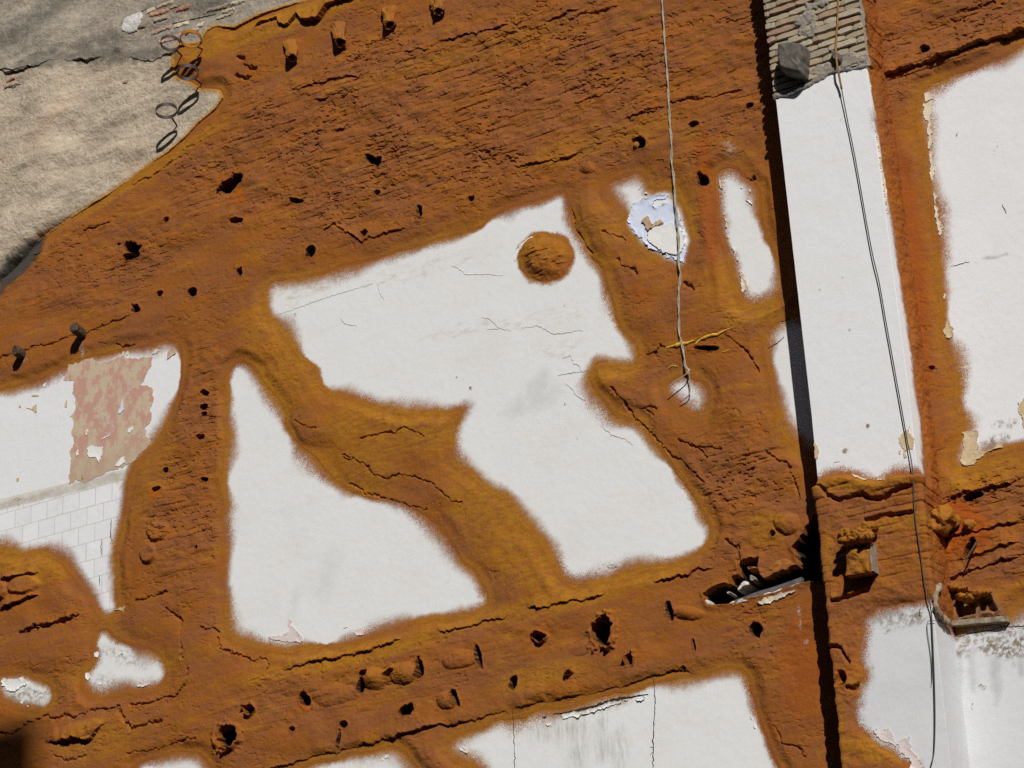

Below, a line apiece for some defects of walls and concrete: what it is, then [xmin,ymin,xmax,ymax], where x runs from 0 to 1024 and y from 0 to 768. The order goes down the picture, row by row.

peeling [923,92,944,236]
peeling [627,186,687,263]
peeling [63,346,176,484]
crack [342,425,464,511]
peeling [960,430,1003,466]
crack [53,753,87,763]
crack [0,588,271,755]
crack [543,680,656,767]
peeling [562,696,645,719]
peeling [873,728,922,768]